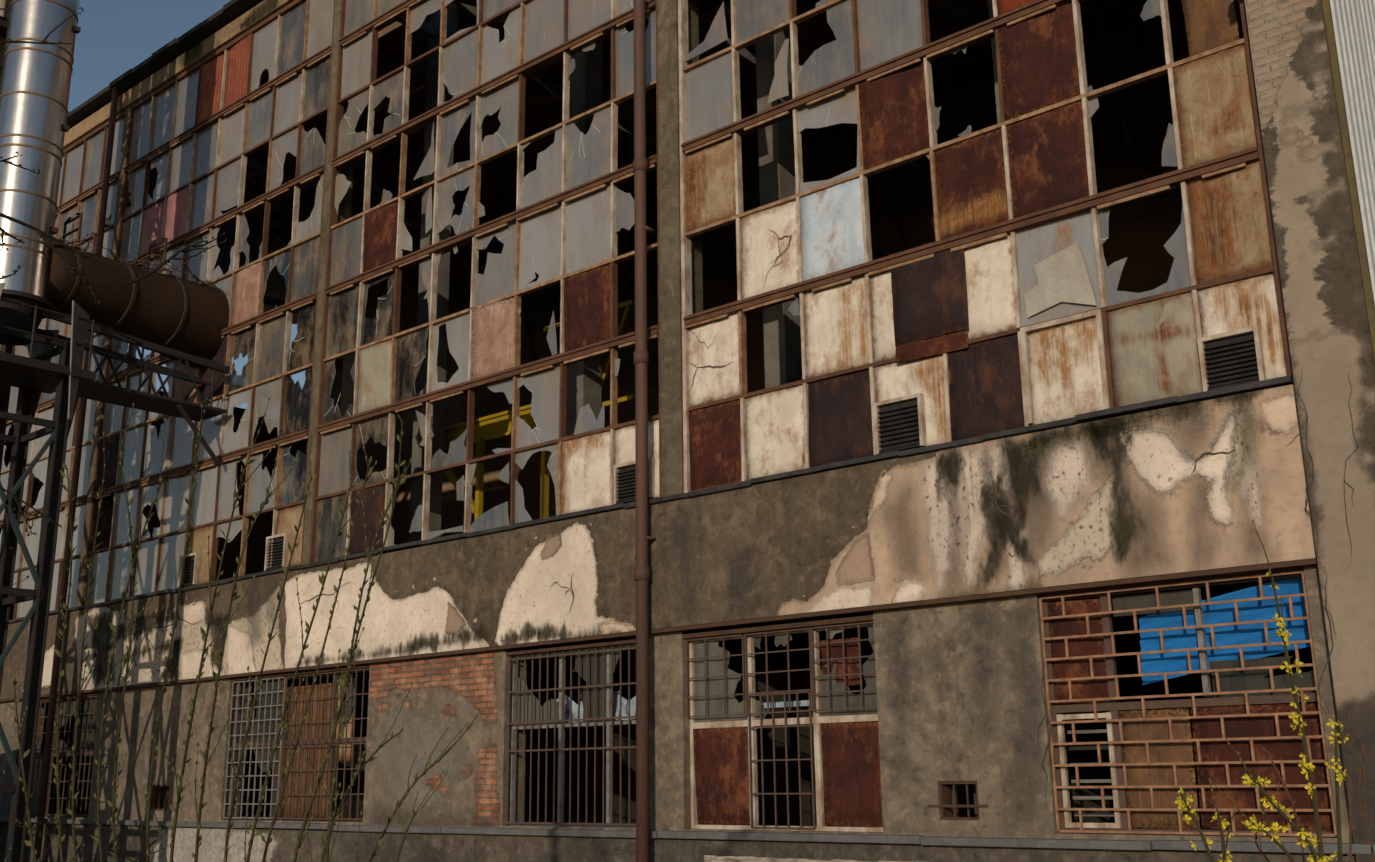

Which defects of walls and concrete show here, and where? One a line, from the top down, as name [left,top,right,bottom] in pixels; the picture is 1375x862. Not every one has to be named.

corrosion [1034,317,1095,383]
flaking render [777,0,1375,709]
corrosion [1152,302,1180,391]
corrosion [1215,283,1285,363]
leakage [923,390,1262,595]
flaking render [41,642,59,690]
leakage [90,610,180,686]
leakage [208,615,227,672]
flaking render [75,520,636,827]